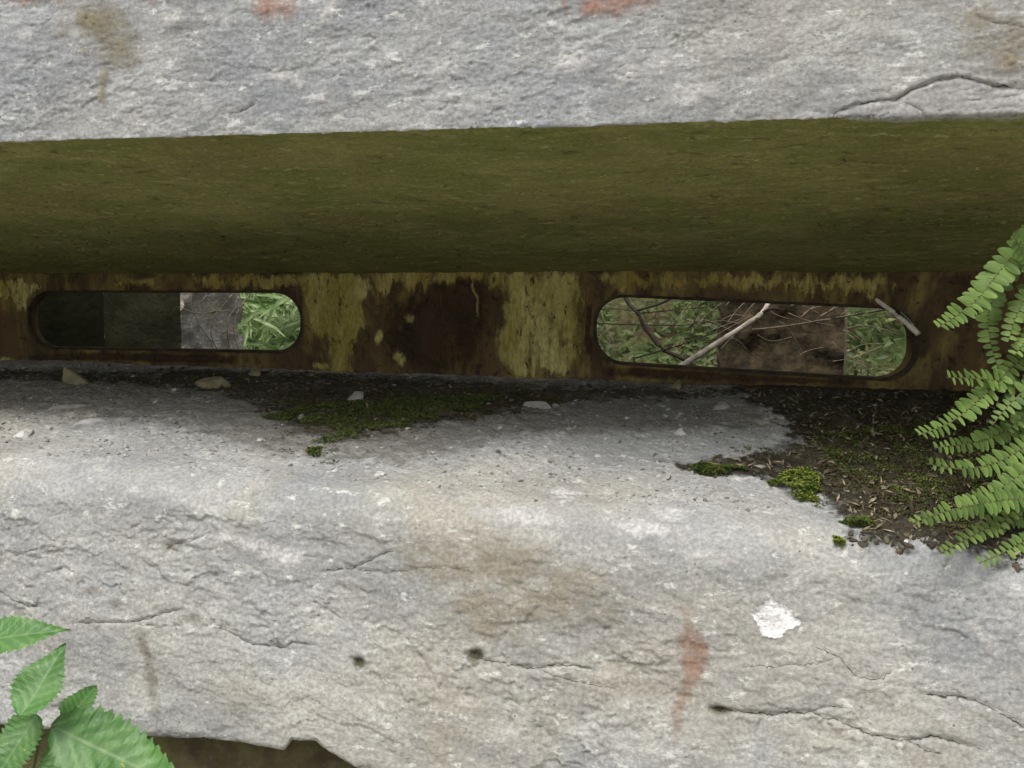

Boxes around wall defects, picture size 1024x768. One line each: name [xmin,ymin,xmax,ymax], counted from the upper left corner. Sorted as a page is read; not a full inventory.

crack [833,77,1020,116]
rust [382,276,482,372]
rust [42,352,234,363]
crack [327,551,472,573]
crack [73,610,177,628]
crack [480,658,616,689]
rust [681,633,707,679]
crack [749,647,889,680]
crack [920,693,1023,727]
crack [728,706,982,756]